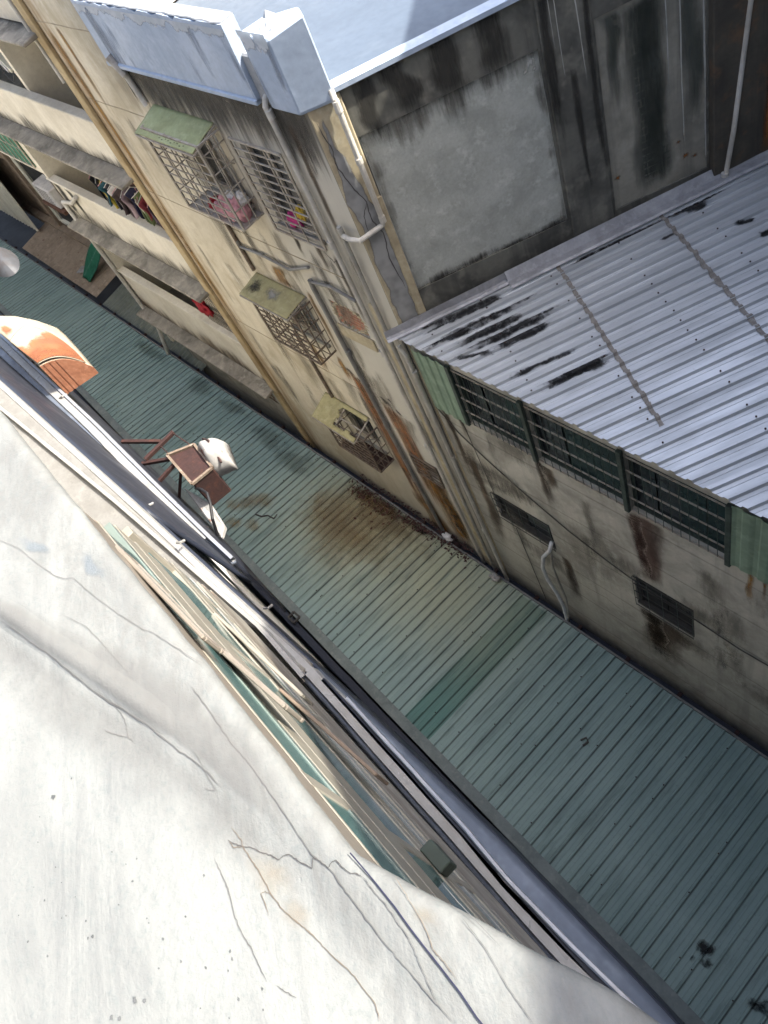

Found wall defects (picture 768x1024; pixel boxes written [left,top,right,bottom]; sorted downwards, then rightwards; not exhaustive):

water stain [0,29,236,320]
water stain [123,71,341,238]
crack [317,124,405,286]
water stain [354,62,427,137]
corrosion [19,332,85,363]
corrosion [338,358,468,543]
water stain [423,295,553,360]
water stain [548,354,608,389]
crack [0,540,203,664]
crack [0,620,219,790]
crack [192,687,457,1018]
crack [441,882,533,1023]